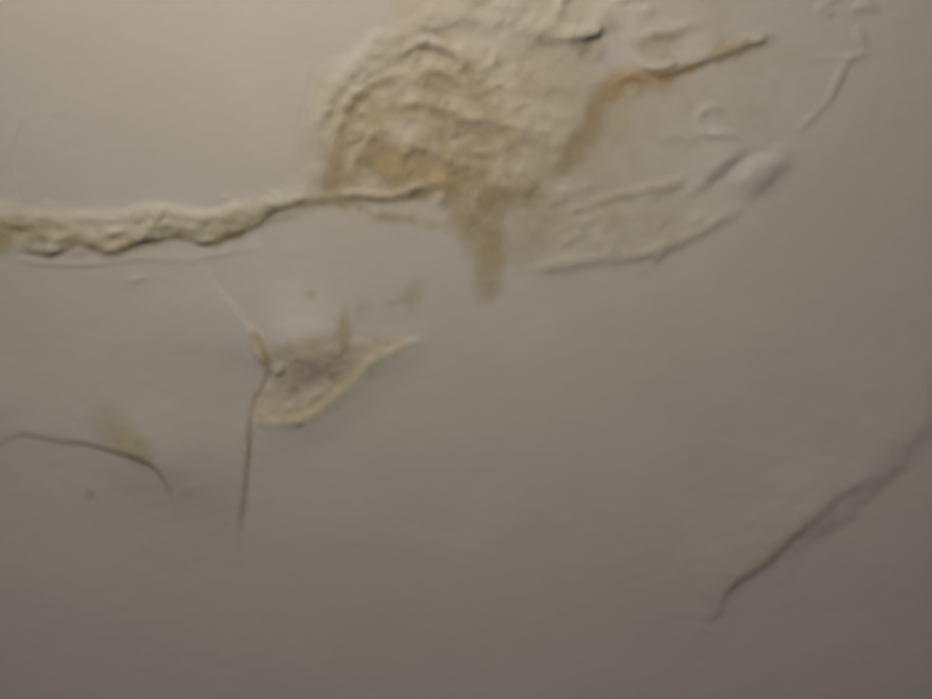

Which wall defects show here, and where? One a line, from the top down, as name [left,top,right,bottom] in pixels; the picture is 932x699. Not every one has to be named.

spalling [0,174,439,466]
damp [205,225,245,245]